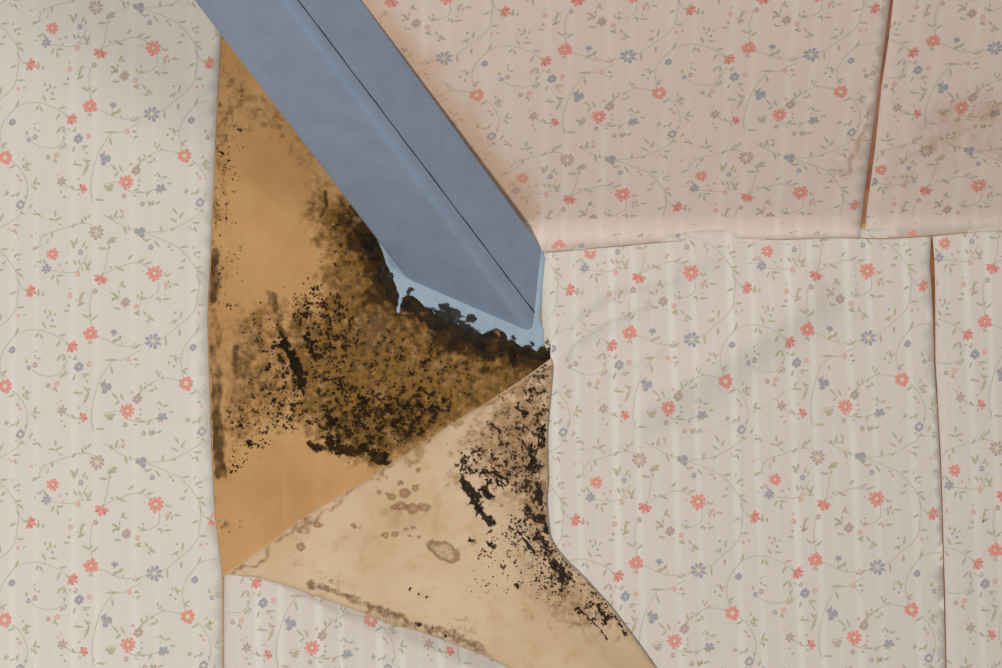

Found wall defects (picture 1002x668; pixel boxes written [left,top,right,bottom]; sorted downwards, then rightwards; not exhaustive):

water stain [209,137,243,311]
flaking render [207,35,532,578]
water stain [211,191,628,640]
water stain [368,605,477,649]